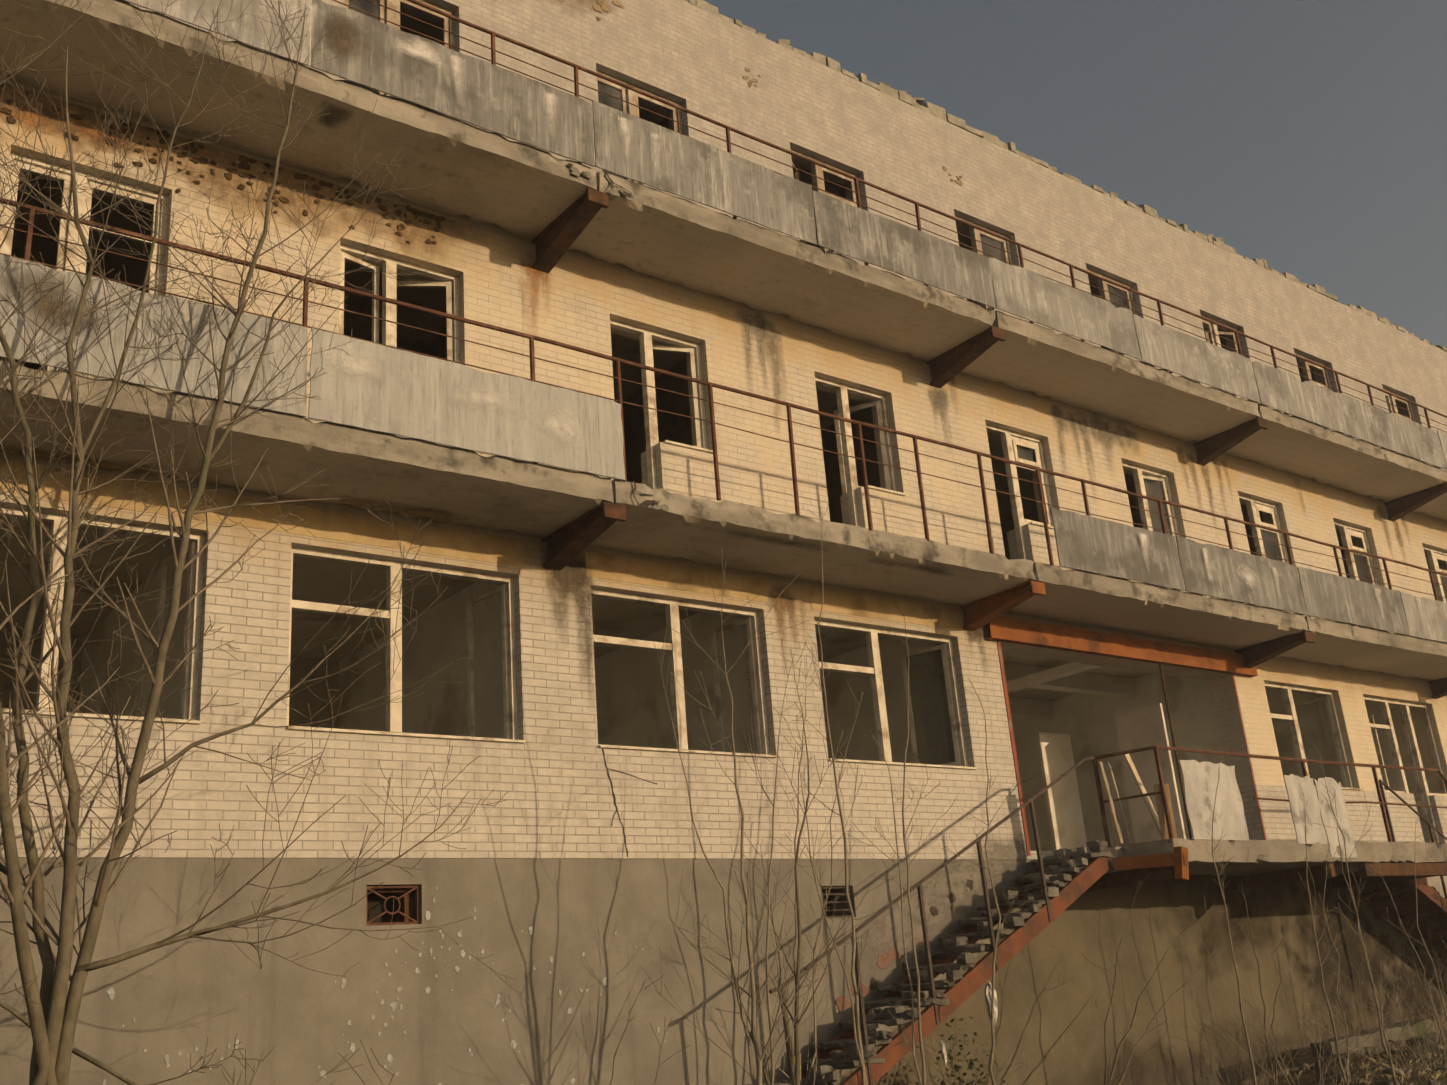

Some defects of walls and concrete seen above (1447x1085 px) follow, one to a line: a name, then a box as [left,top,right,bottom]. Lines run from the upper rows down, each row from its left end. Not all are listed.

spalling [581,0,625,21]
leakage [744,315,779,393]
leakage [1053,407,1136,451]